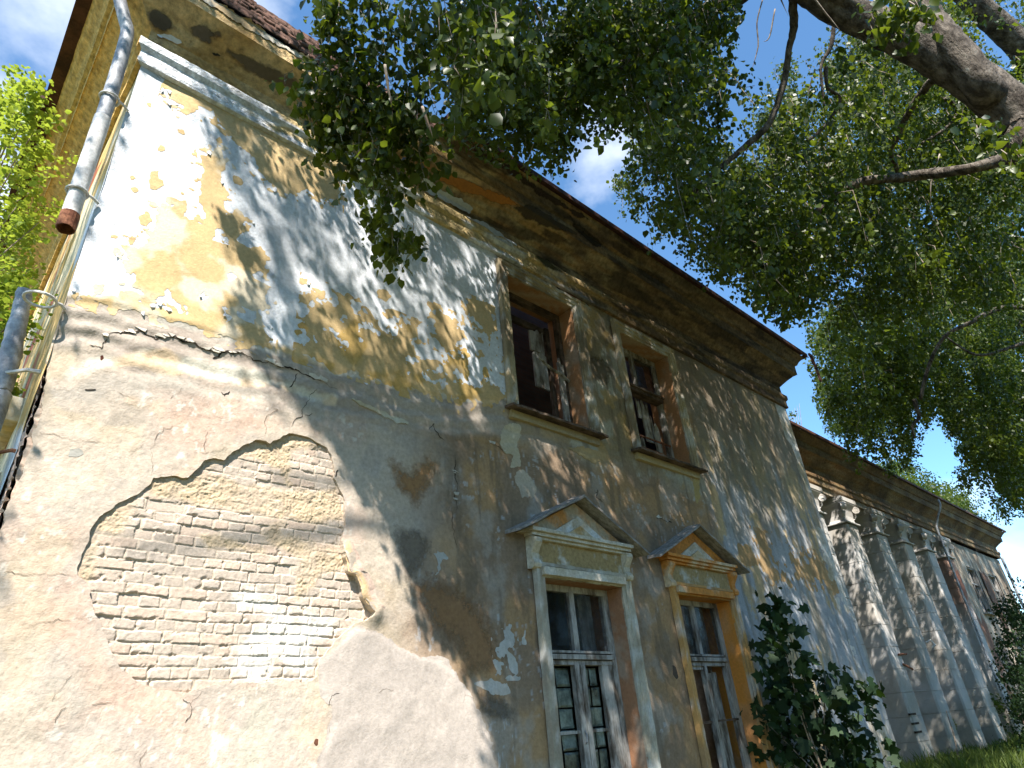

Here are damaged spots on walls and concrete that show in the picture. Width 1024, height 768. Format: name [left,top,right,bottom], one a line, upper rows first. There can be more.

damp [148,9,172,31]
damp [191,25,221,44]
spalling [203,0,325,74]
peeling [68,80,346,358]
damp [514,205,602,247]
crack [91,310,332,429]
peeling [292,272,537,498]
damp [590,357,612,385]
spalling [77,434,385,693]
peeling [474,624,527,696]